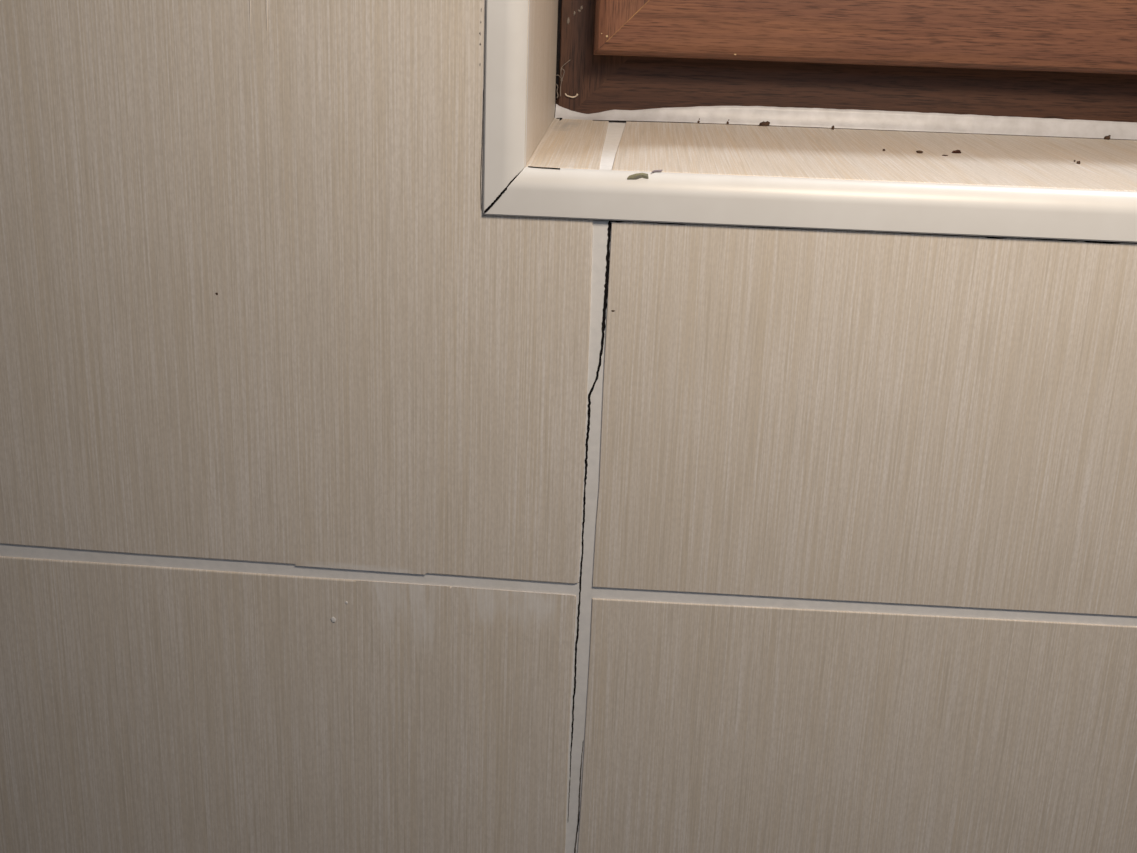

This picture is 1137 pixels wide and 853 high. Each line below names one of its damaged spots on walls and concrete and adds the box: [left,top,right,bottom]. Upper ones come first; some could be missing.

crack [565,218,1137,853]